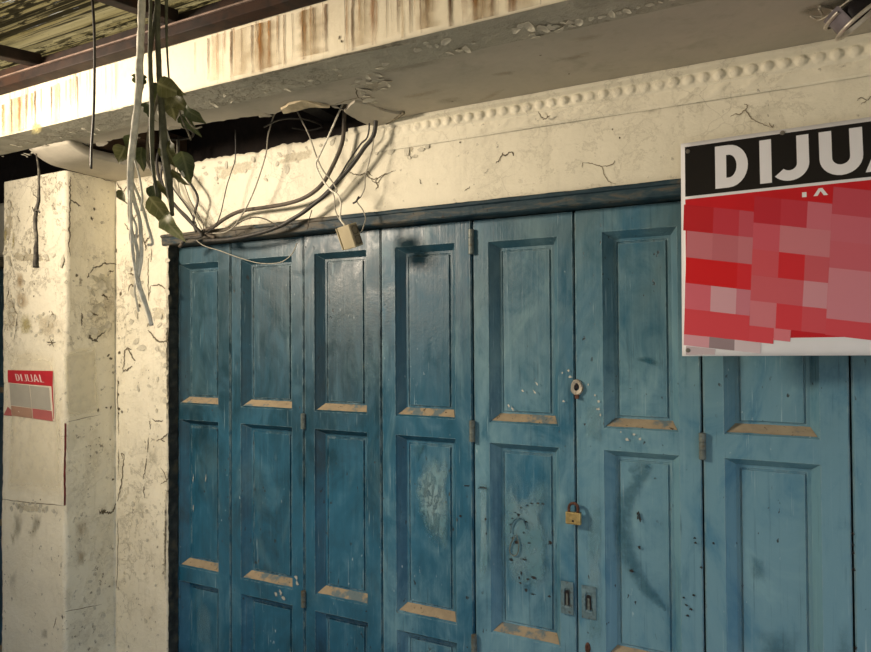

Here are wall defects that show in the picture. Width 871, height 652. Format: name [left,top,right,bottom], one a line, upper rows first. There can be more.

corrosion [230,4,327,64]
peeling [512,0,675,39]
corrosion [2,88,36,126]
crack [350,171,393,189]
crack [68,171,127,256]
crack [87,224,170,301]
crack [81,294,109,342]
crack [69,347,168,588]